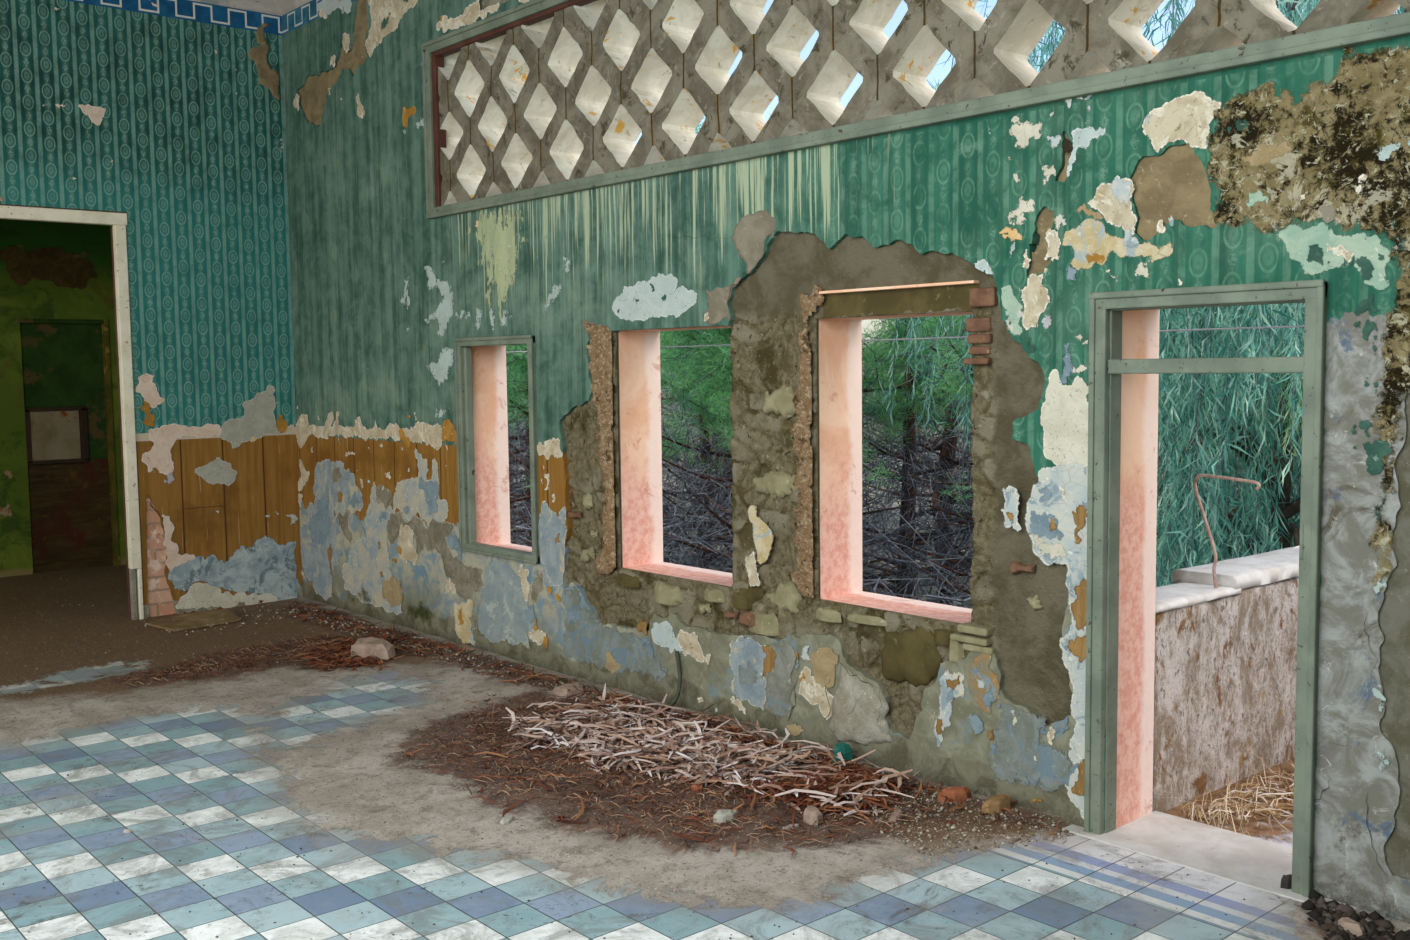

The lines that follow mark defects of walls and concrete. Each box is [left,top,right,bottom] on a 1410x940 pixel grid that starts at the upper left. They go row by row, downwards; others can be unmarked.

spalling [248,0,418,125]
spalling [436,0,529,33]
peeling [1276,222,1391,351]
spalling [136,91,1221,820]
spalling [1351,393,1410,879]